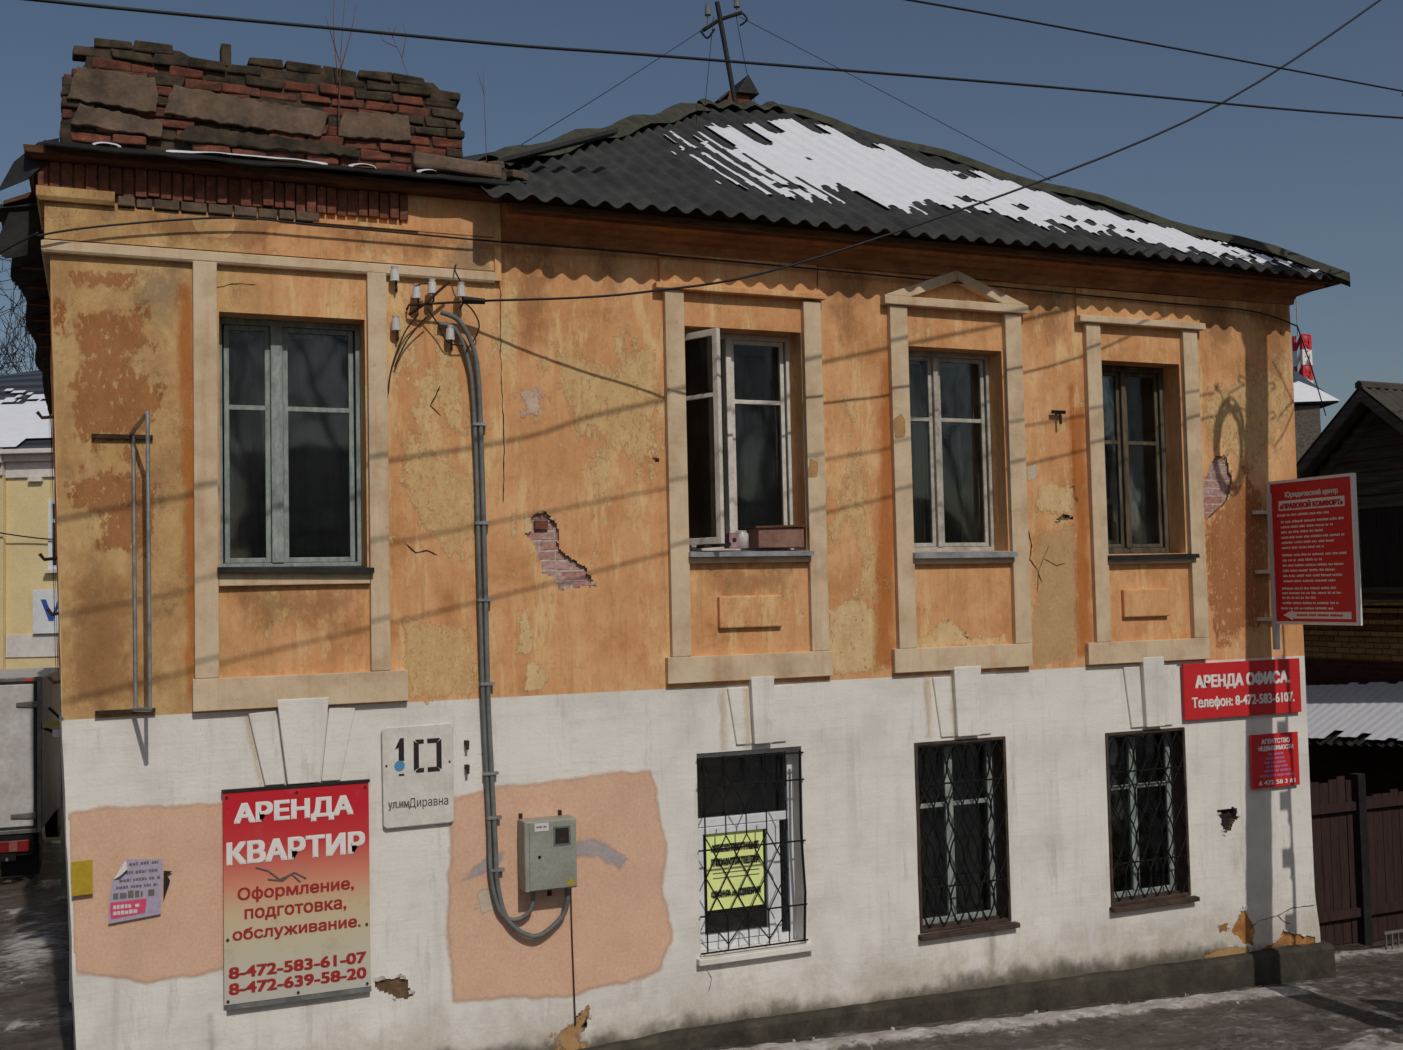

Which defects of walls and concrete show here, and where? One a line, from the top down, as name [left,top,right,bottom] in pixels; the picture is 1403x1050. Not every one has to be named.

peeling [1202,339,1294,647]
spalling [510,509,597,591]
spalling [1217,807,1241,835]
peeling [1205,906,1315,959]
peeling [373,974,415,1000]
peeling [551,1005,591,1050]